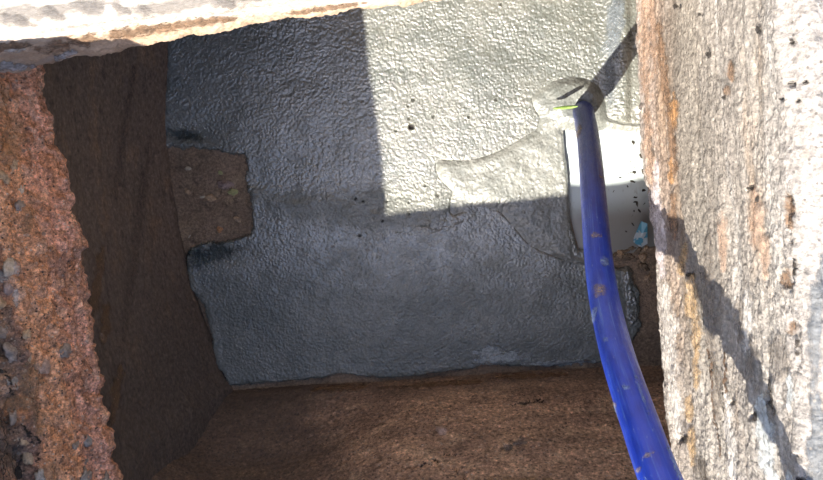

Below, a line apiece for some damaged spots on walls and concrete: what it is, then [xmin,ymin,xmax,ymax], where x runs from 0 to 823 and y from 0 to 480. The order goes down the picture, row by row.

water stain [0,0,335,35]